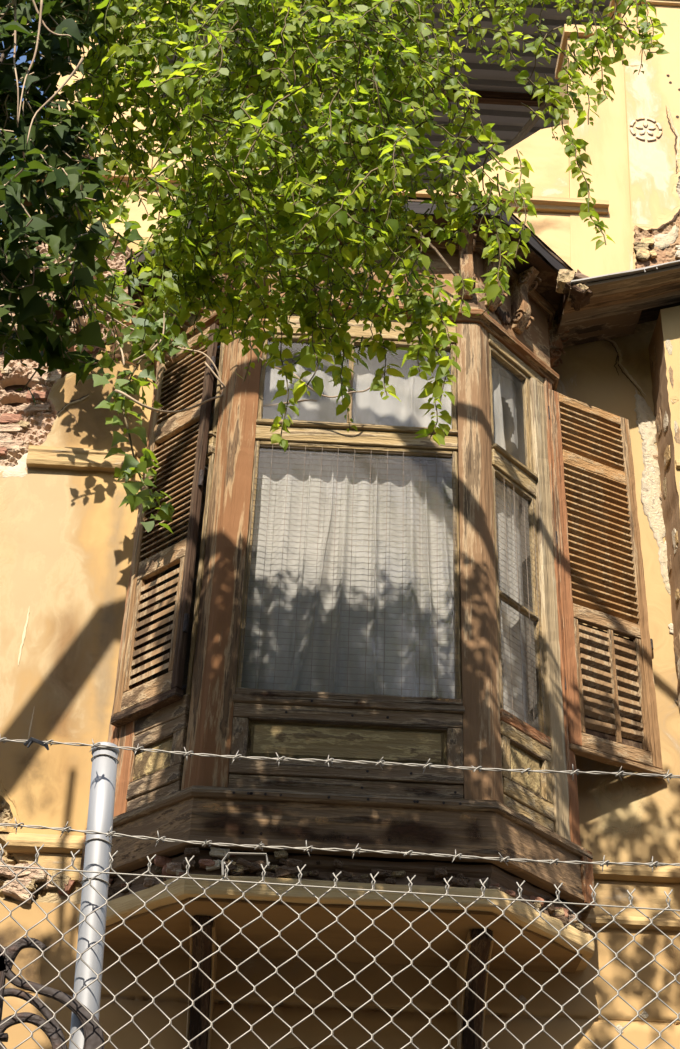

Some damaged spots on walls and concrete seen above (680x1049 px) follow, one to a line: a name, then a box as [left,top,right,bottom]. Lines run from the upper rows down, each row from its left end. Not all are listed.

spalling [18,241,73,283]
spalling [57,236,135,360]
flaking render [633,146,680,269]
spalling [0,346,71,478]
peeling [634,339,680,603]
spalling [668,623,680,711]
flaking render [0,777,20,829]